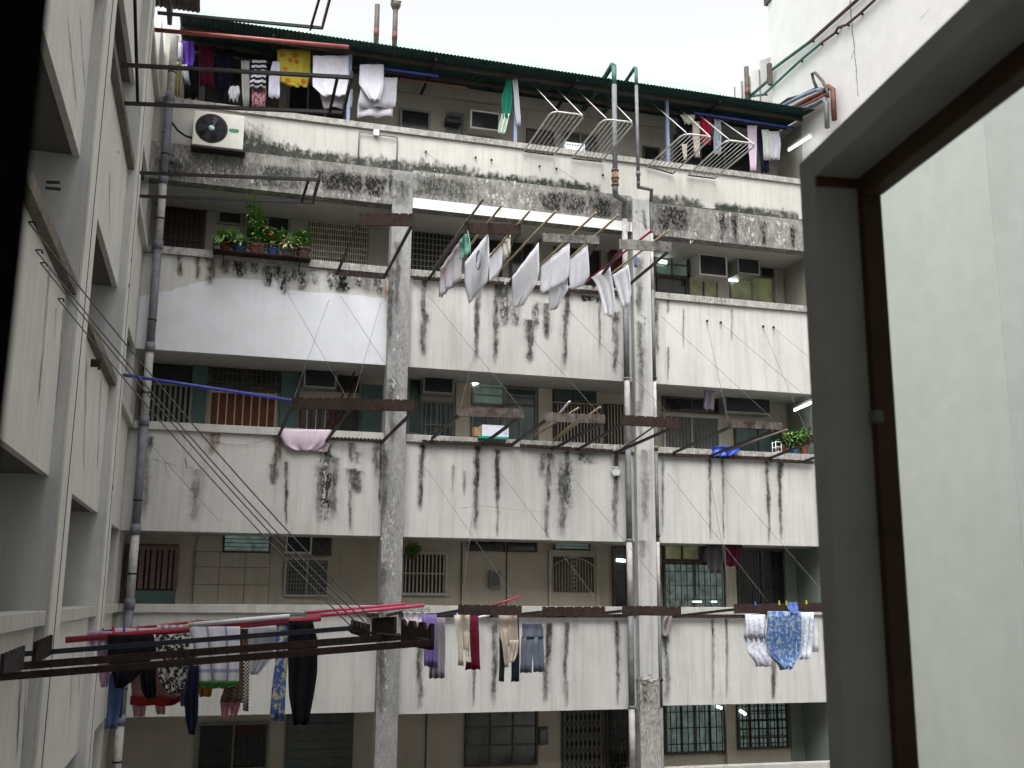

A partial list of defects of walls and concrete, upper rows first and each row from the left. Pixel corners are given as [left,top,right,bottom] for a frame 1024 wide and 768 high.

leakage [243,131,631,235]
leakage [653,195,799,247]
leakage [195,243,400,337]
leakage [493,285,550,360]
leakage [563,292,619,368]
leakage [272,437,288,522]
leakage [319,442,361,520]
leakage [463,447,480,522]
leakage [540,451,593,527]
leakage [765,461,783,531]
leakage [543,624,552,696]